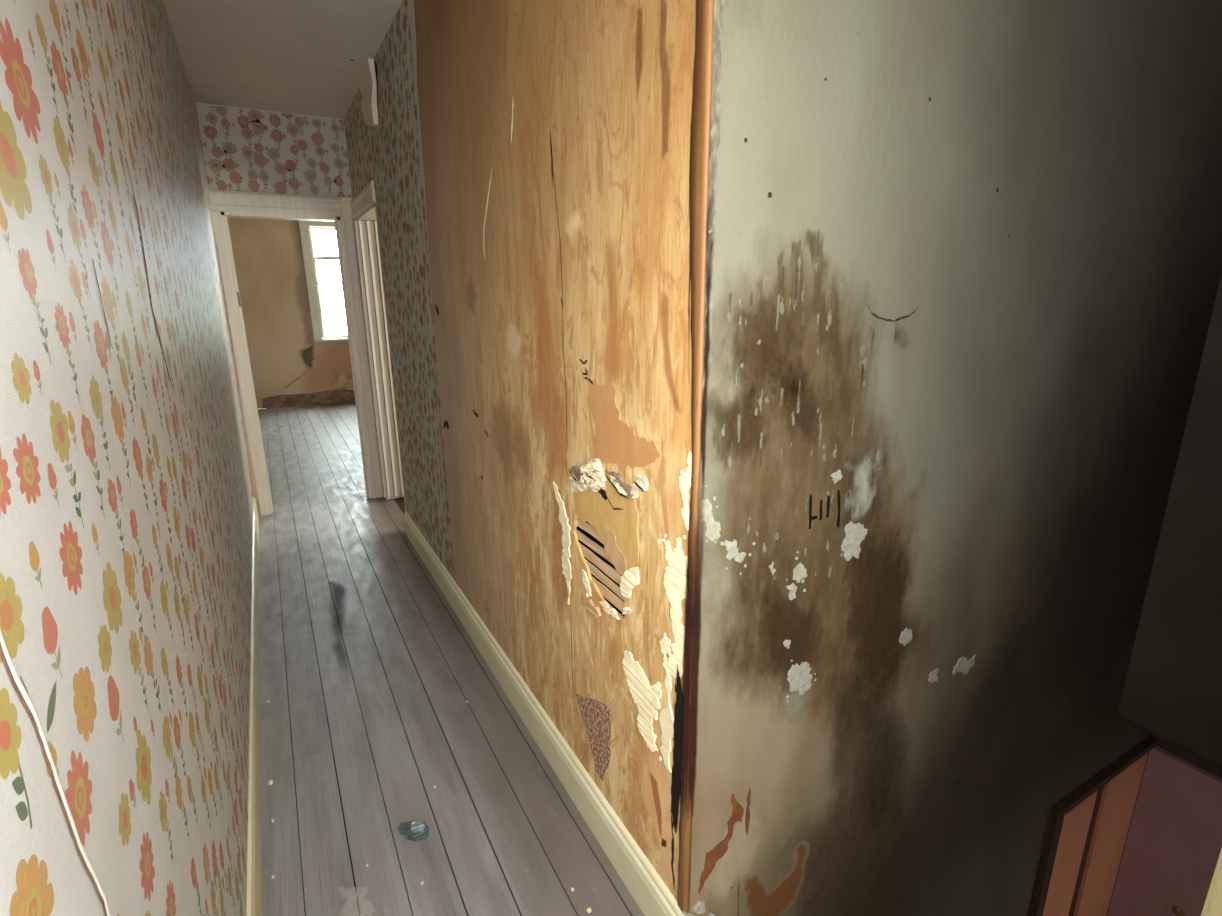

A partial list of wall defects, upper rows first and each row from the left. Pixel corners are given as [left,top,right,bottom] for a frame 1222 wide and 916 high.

flaking render [553,380,660,620]
peeling [622,452,756,773]
spalling [768,551,807,600]
damp [680,199,946,916]
spalling [841,521,868,561]
spalling [899,628,912,646]
spalling [779,640,816,712]
corrosion [742,840,810,916]